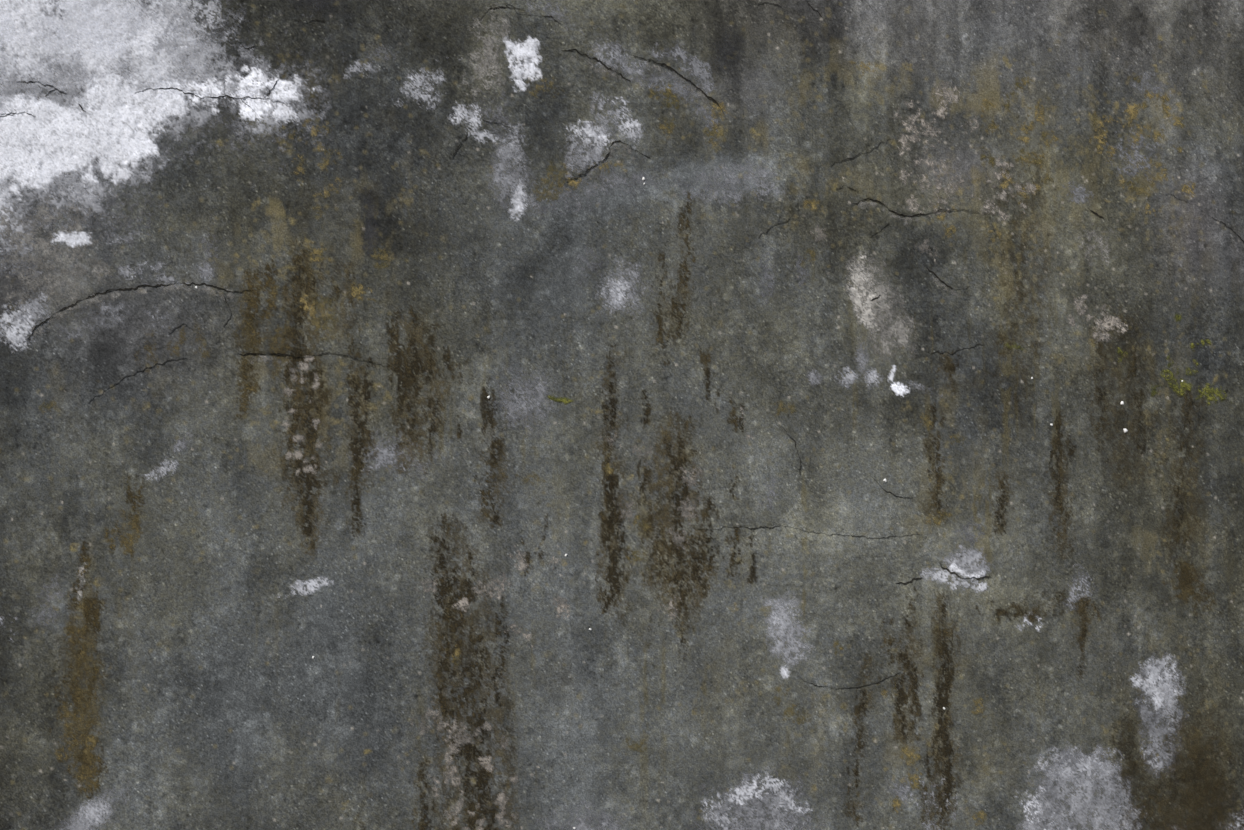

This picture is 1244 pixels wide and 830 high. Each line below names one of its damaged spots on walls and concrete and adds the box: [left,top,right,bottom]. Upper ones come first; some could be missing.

crack [480,3,726,116]
crack [836,141,980,236]
damp [279,240,473,553]
damp [597,346,764,653]
damp [414,514,515,830]
damp [695,771,812,830]
damp [764,597,810,678]
damp [845,588,959,830]
damp [1021,654,1244,830]